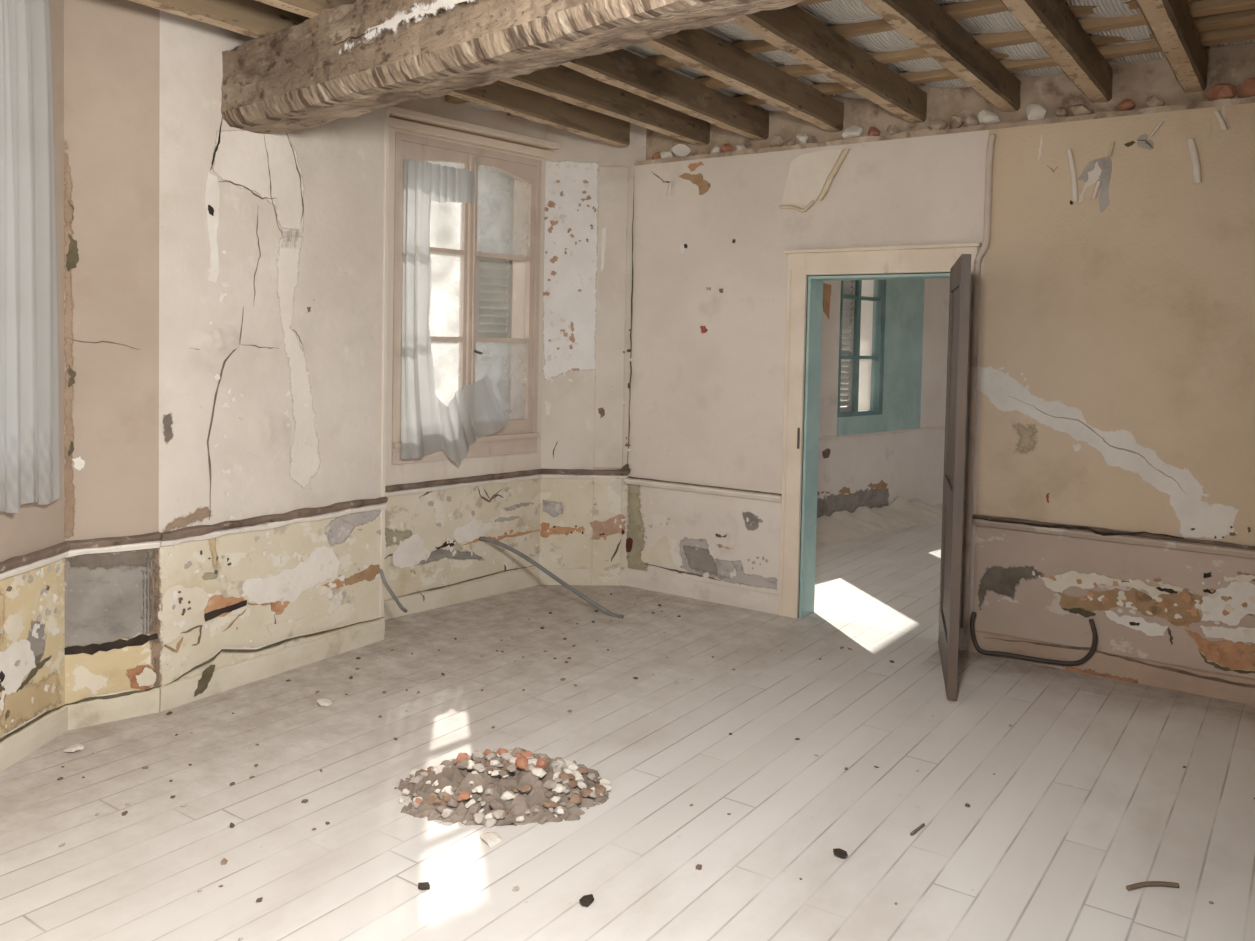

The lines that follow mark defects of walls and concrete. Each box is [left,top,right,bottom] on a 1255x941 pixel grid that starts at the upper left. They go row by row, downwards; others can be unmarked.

peeling [779,148,850,212]
peeling [1038,121,1164,213]
crack [189,116,304,520]
peeling [543,160,607,383]
flaking render [868,480,888,491]
crack [1009,396,1187,495]
peeling [158,483,626,645]
peeling [0,610,59,729]
flaking render [1032,570,1255,674]